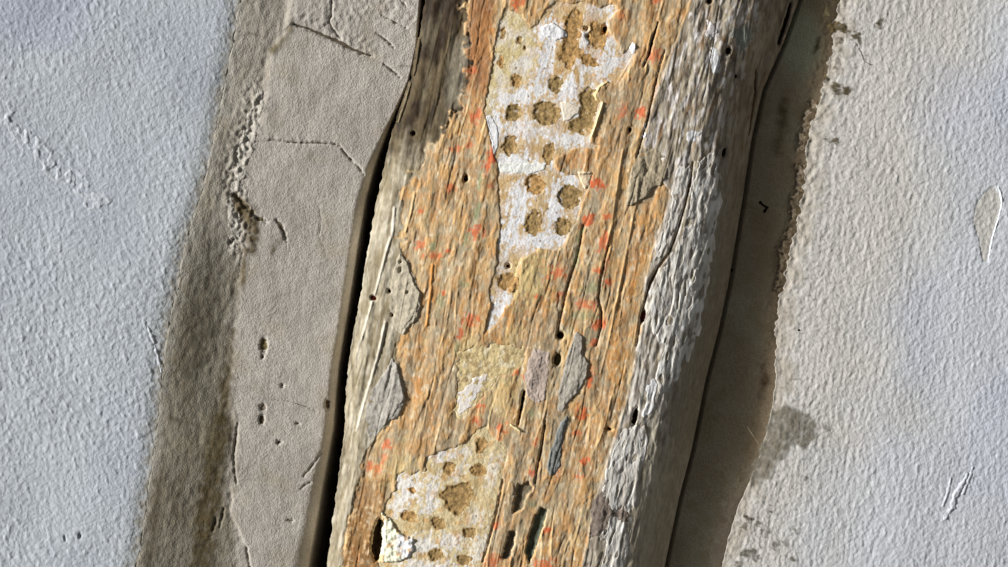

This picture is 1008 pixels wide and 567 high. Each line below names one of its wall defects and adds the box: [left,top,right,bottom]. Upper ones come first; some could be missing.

crack [294,0,406,75]
crack [279,141,362,171]
peeling [484,1,636,333]
damp [190,367,229,567]
peeling [371,426,507,567]
damp [751,406,815,485]